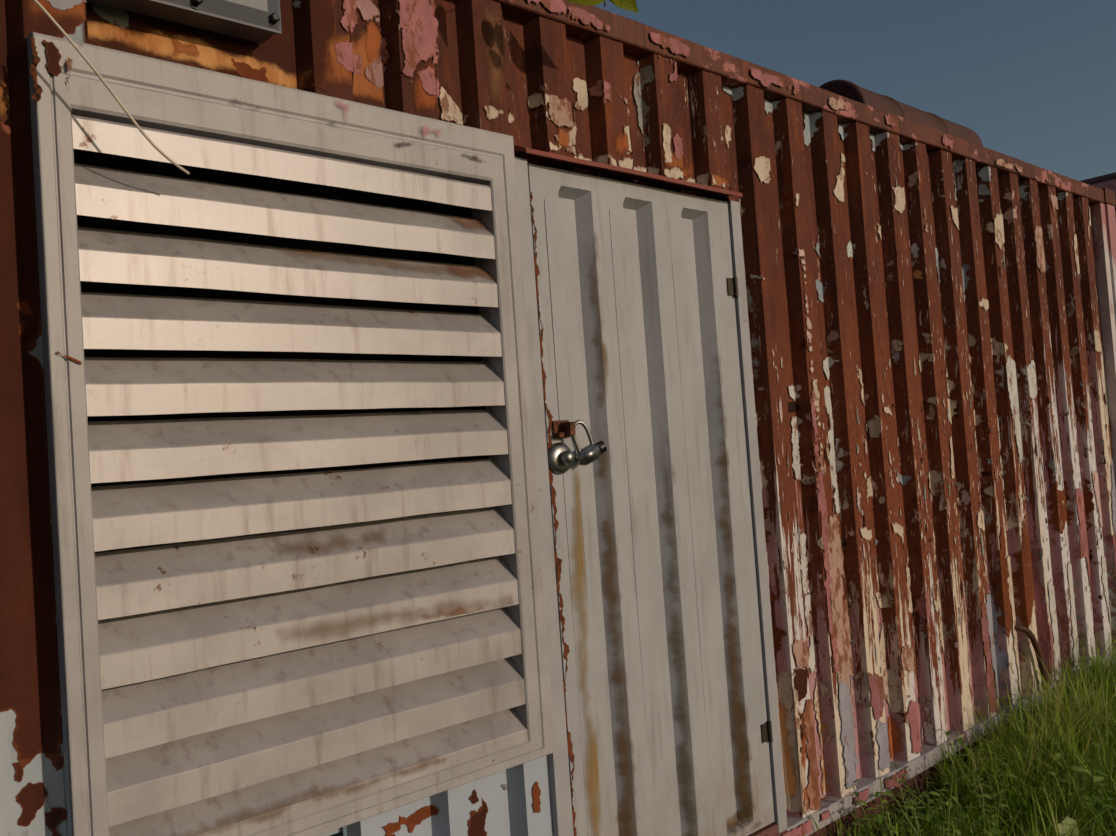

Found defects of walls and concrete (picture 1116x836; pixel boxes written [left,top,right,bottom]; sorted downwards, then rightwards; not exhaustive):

peeling [335,0,469,125]
peeling [528,32,746,218]
peeling [804,97,852,202]
rust [0,0,384,836]
rust [530,193,553,450]
peeling [978,338,1038,531]
rust [383,805,439,836]
rust [467,790,488,836]
rust [548,468,600,836]
rust [726,622,752,830]
peeling [776,330,939,836]
peeling [975,460,1116,714]